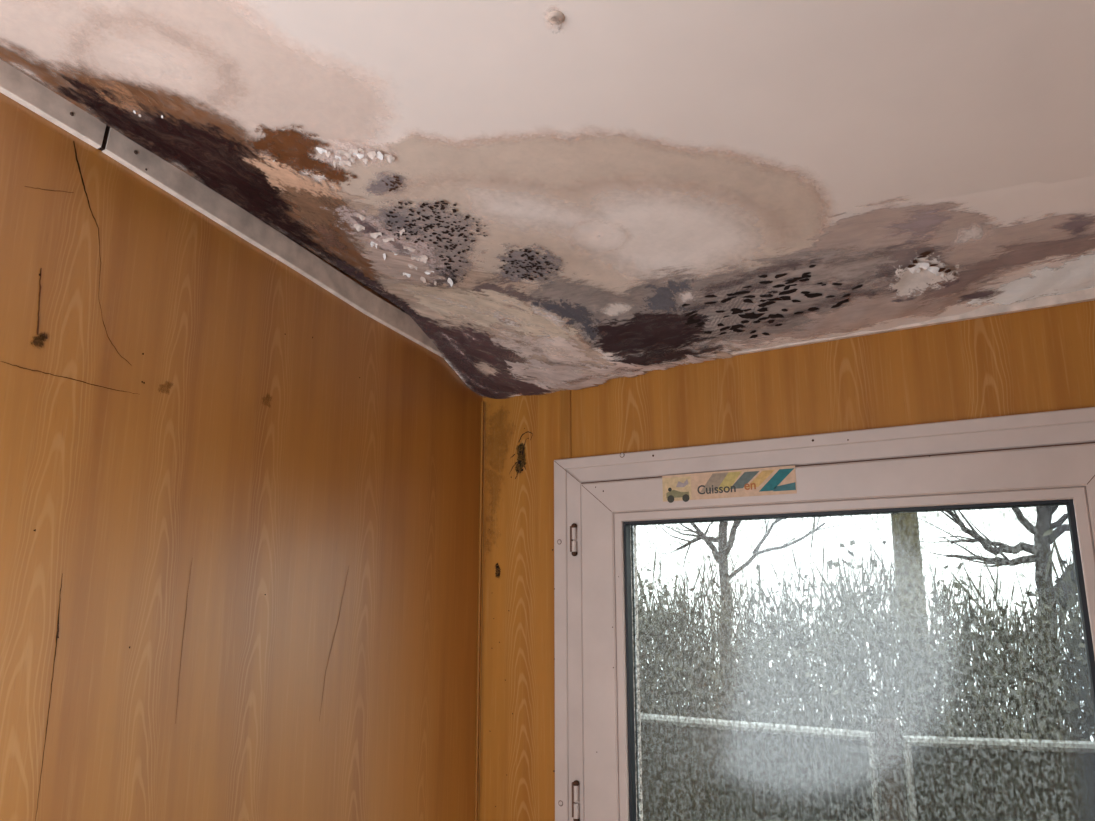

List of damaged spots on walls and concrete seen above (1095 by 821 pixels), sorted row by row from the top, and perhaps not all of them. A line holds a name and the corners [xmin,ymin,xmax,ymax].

water stain [0,0,1095,368]
peeling [887,251,959,302]
peeling [959,251,1095,307]
crack [35,573,63,821]